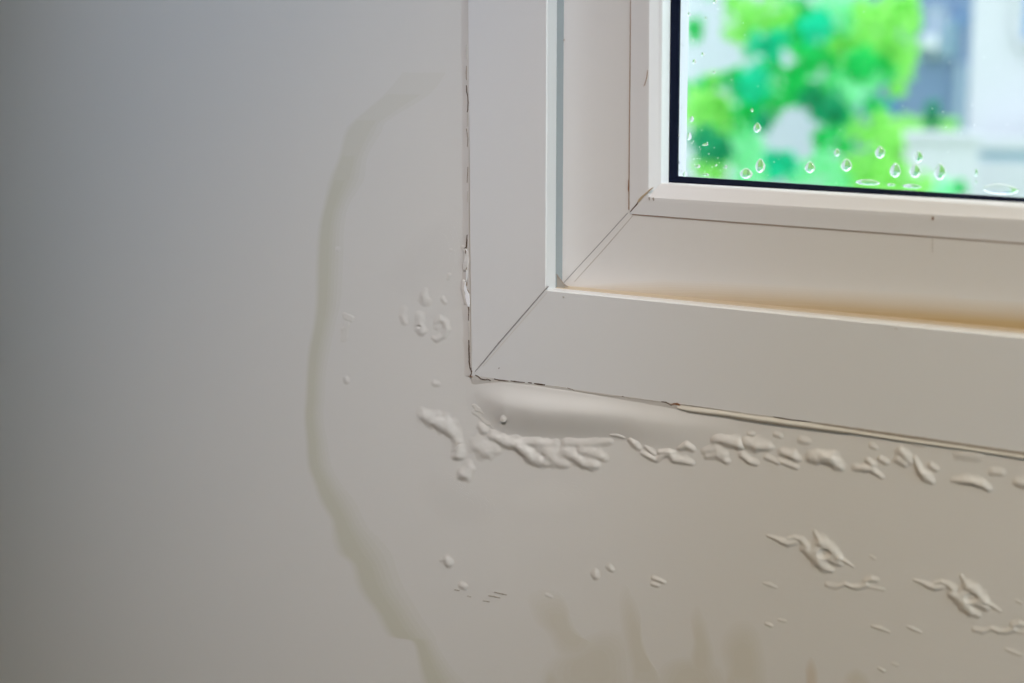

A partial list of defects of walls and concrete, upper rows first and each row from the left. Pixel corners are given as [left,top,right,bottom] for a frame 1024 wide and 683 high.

water stain [303,73,465,683]
water stain [528,585,767,683]